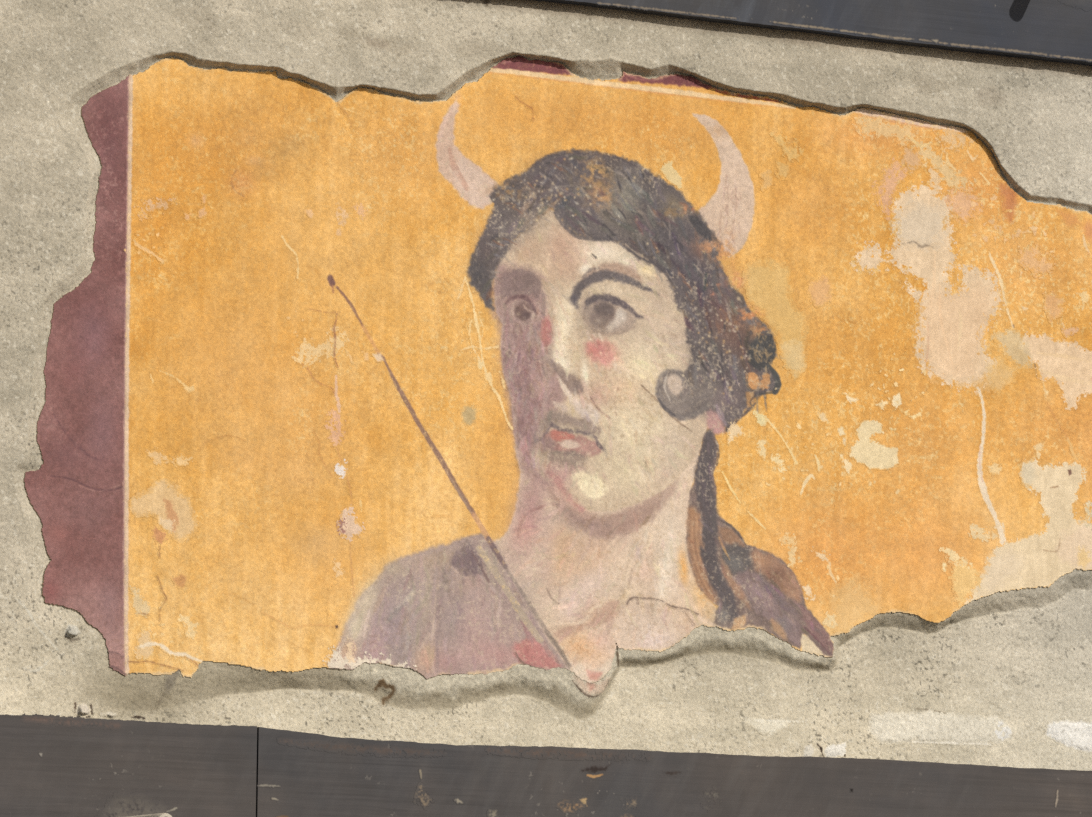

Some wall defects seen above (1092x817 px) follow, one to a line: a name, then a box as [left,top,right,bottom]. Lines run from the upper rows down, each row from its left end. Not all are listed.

peeling [753,112,1092,496]
peeling [725,420,745,445]
crack [976,386,1008,545]
peeling [939,442,1092,608]